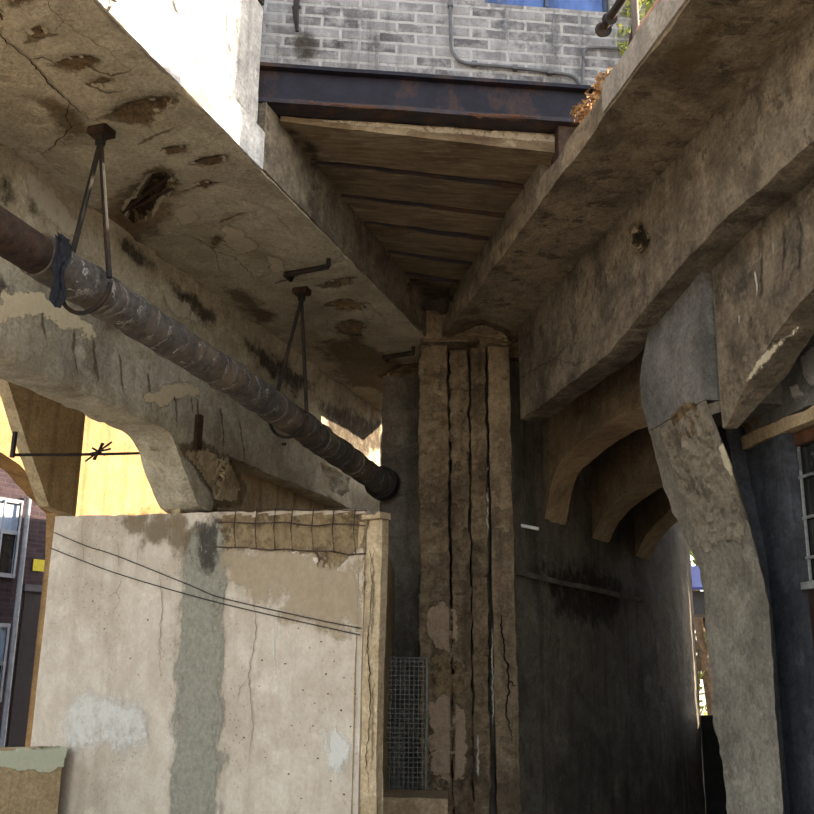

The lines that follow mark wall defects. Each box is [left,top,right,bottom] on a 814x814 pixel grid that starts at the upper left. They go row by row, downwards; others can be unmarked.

crack [0,33,101,154]
spalling [53,54,99,71]
spalling [103,96,178,126]
spalling [121,168,176,225]
peeling [790,346,814,397]
spalling [179,441,368,569]
spalling [661,401,747,555]
leakage [123,509,374,814]
crack [500,614,516,741]